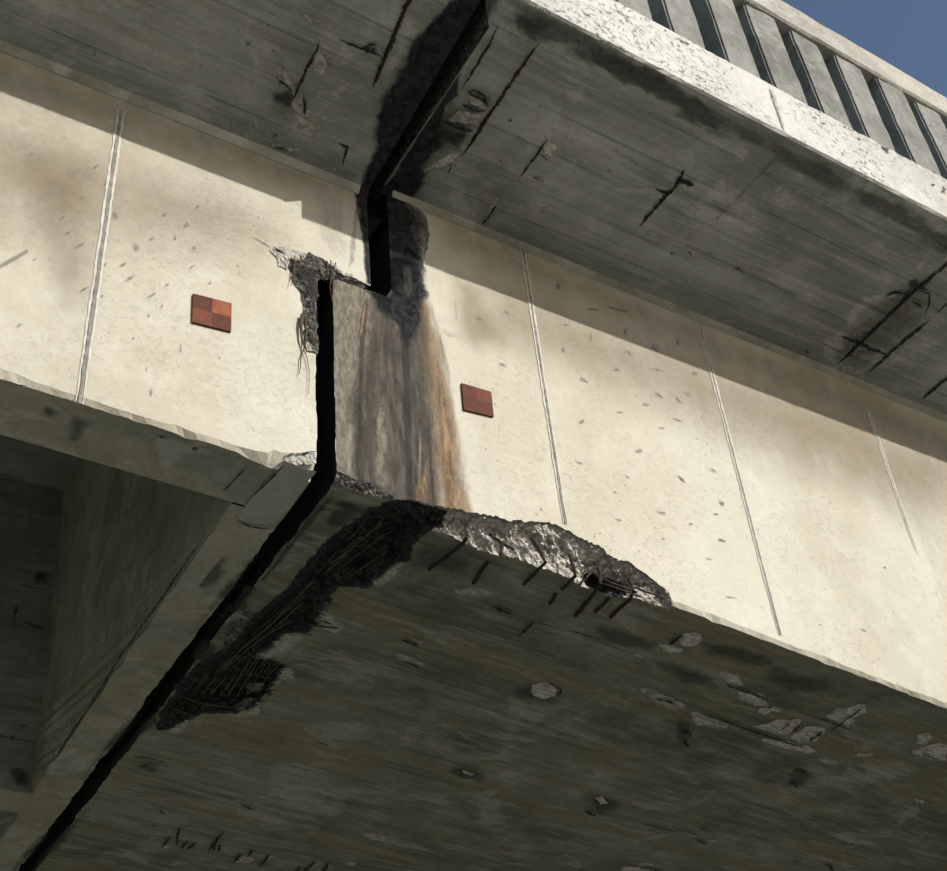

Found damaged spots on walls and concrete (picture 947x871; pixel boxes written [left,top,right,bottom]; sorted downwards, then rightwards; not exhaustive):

crack [339,0,412,88]
spalling [254,195,430,354]
crack [339,143,349,166]
water stain [333,0,480,506]
crack [639,171,693,227]
rust [423,301,470,512]
crack [923,378,947,399]
crack [54,534,205,760]
spalling [156,499,673,733]
spalling [641,672,867,764]